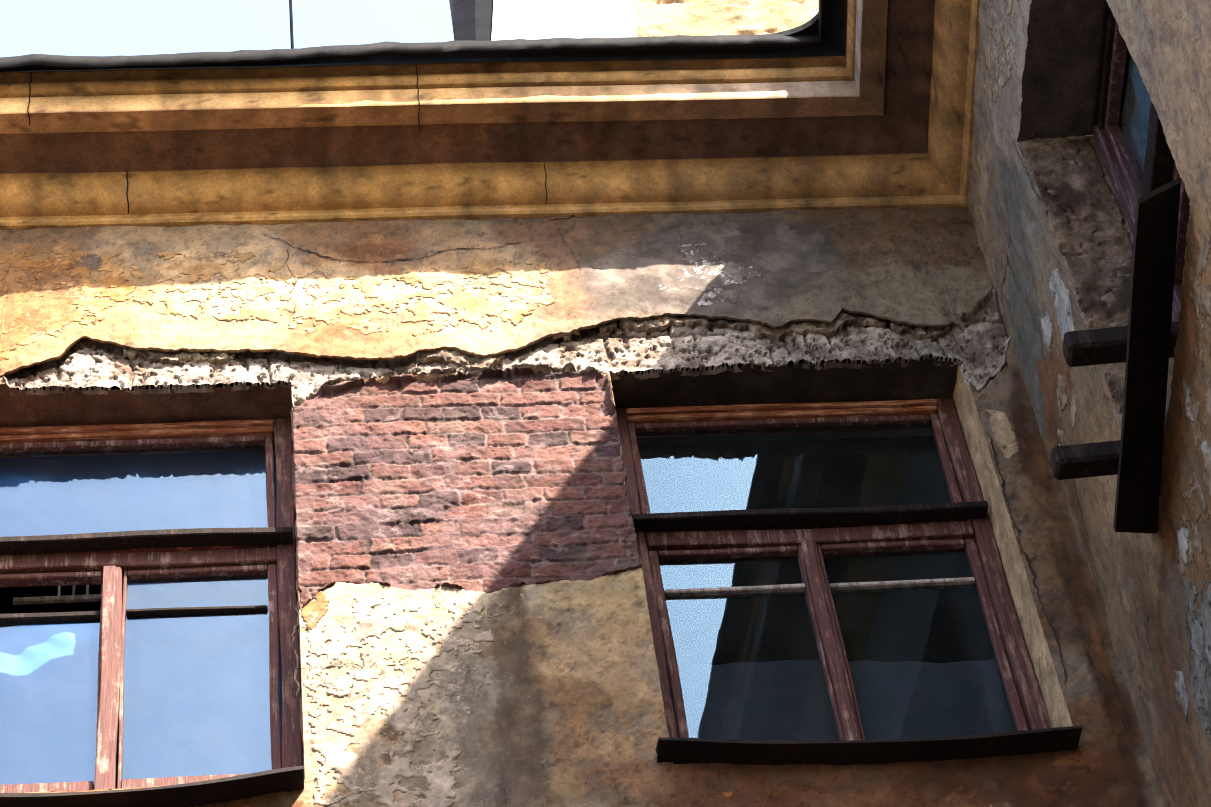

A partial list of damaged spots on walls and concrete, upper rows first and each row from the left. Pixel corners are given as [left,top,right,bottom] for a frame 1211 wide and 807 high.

flaking render [1022,138,1133,353]
flaking render [0,243,1010,807]
peeling [985,409,1019,459]
peeling [1056,373,1077,446]
flaking render [1102,362,1126,424]
peeling [1164,226,1211,735]
damp [356,720,375,807]
damp [448,585,551,807]